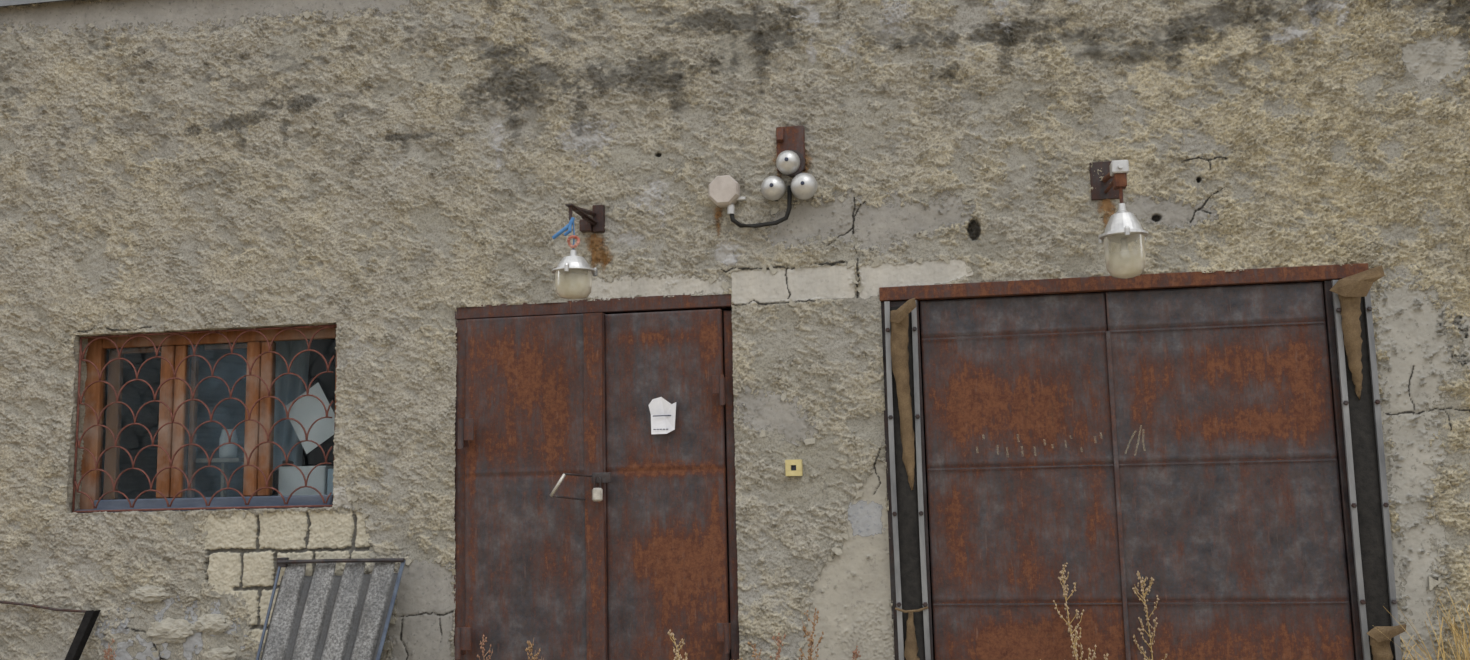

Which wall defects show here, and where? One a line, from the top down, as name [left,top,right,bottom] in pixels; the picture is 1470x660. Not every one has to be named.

spalling [589,188,976,306]
crack [721,197,865,306]
crack [1386,366,1470,430]
spalling [94,485,376,660]